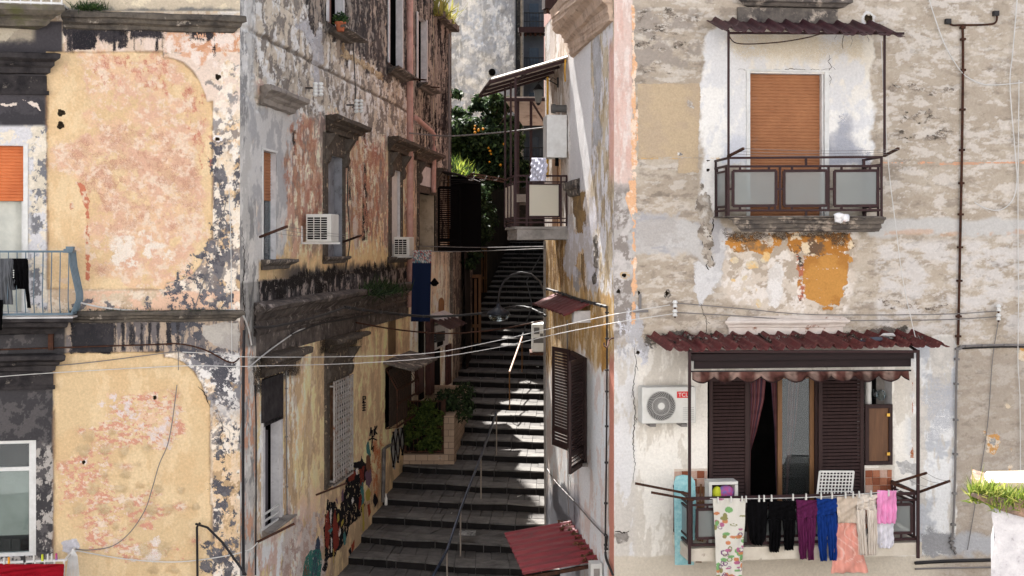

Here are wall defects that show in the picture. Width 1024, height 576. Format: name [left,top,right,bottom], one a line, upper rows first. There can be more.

peeling [45,32,237,311]
water stain [113,322,180,352]
peeling [208,348,240,410]
water stain [257,260,402,299]
peeling [695,157,855,310]
peeling [55,389,240,574]